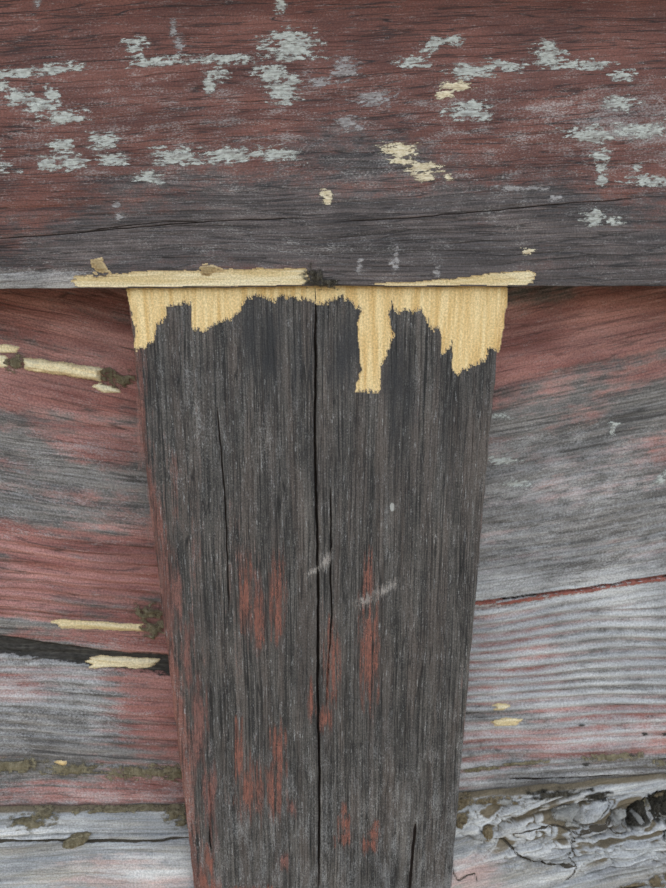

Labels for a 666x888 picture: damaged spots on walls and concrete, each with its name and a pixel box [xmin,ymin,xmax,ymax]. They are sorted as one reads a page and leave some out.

peeling [119,18,363,106]
peeling [390,36,638,122]
peeling [0,60,308,185]
peeling [333,91,398,132]
spalling [375,141,453,182]
peeling [555,94,666,187]
crack [0,218,288,239]
peeling [319,188,333,205]
peeling [578,209,627,227]
spalling [71,266,536,394]
crack [483,574,666,602]
spalling [625,790,666,842]